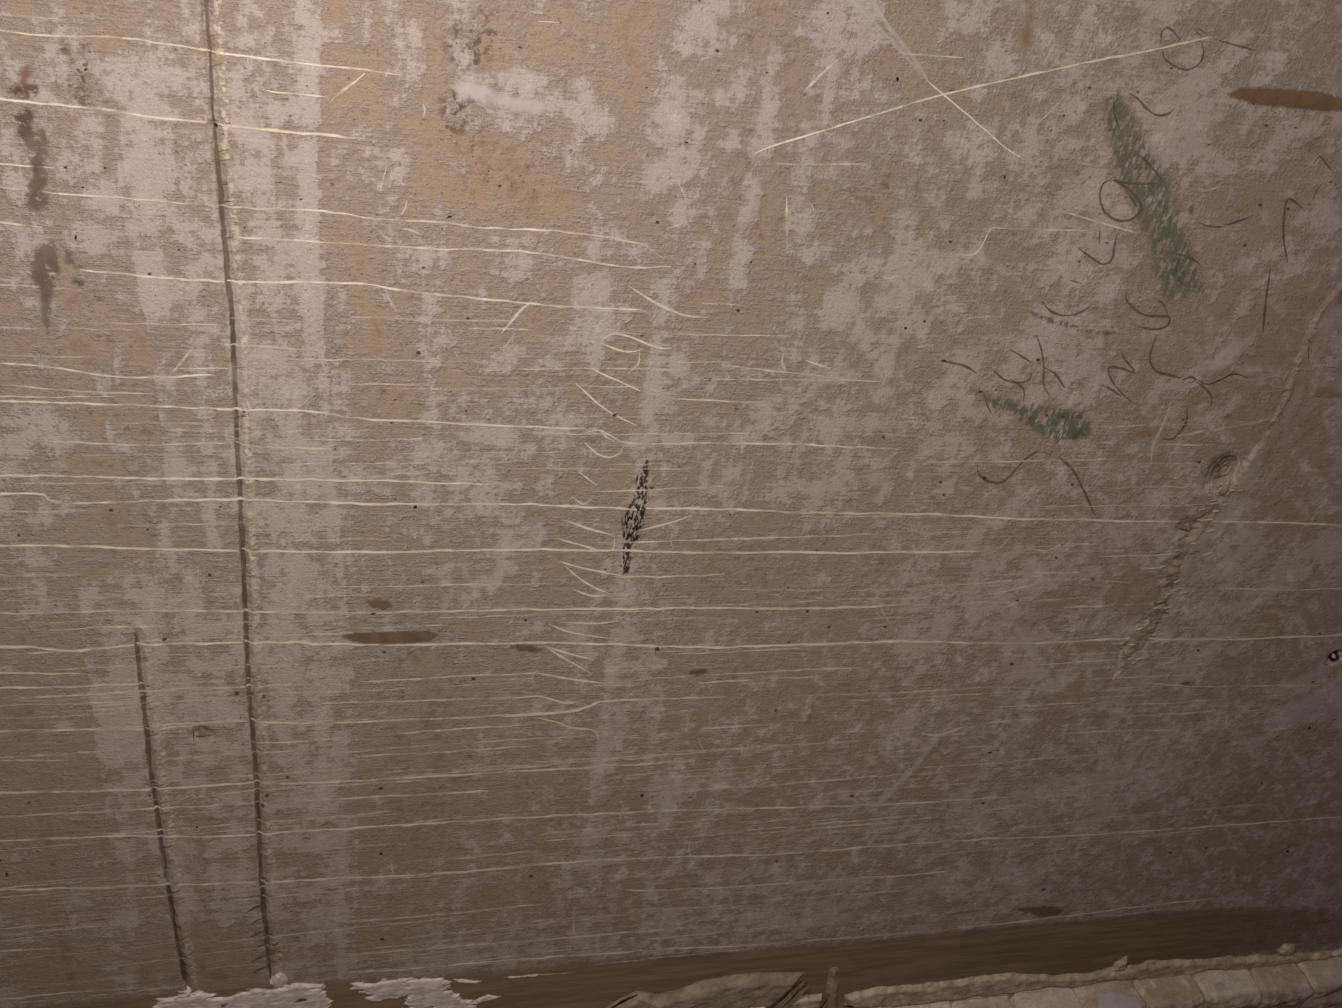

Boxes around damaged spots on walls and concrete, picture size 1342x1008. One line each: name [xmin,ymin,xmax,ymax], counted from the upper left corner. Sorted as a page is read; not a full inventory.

leakage [32,242,72,326]
spalling [213,0,270,784]
peeling [145,632,334,1008]
peeling [350,975,501,1008]
crack [611,994,638,1008]
spalling [757,993,822,1008]
spalling [843,942,1342,1008]